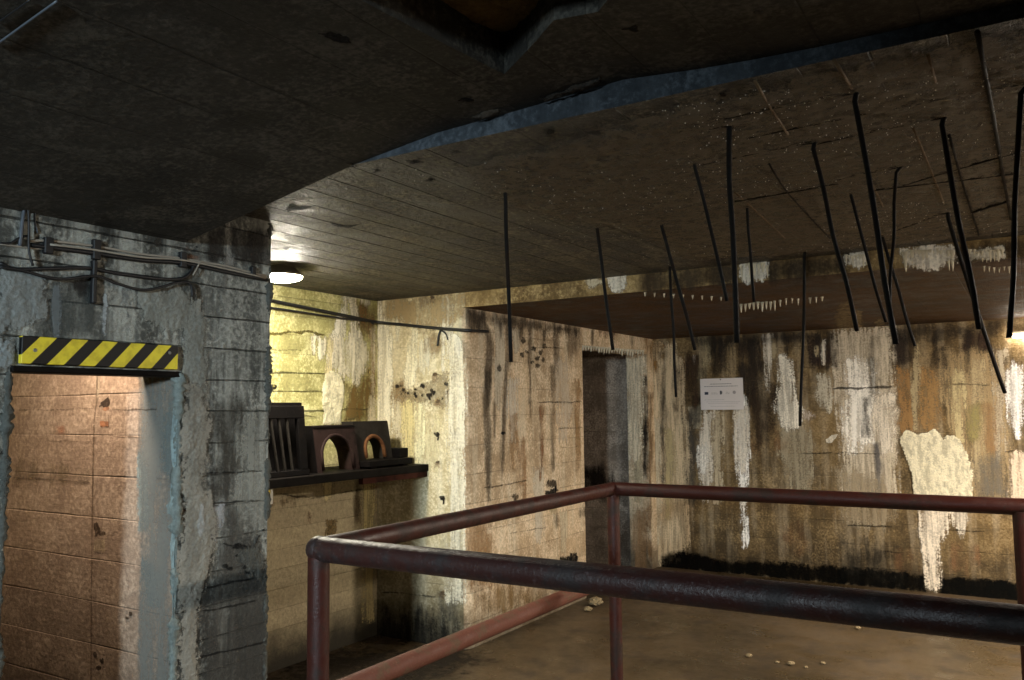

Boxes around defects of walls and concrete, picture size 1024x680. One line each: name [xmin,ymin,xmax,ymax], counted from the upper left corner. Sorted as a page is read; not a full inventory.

spalling [441,0,538,32]
spalling [452,28,1024,260]
leakage [900,241,1024,271]
spalling [520,337,546,368]
spalling [395,371,456,410]
leakage [311,295,594,513]
leakage [626,301,1024,498]
leakage [584,465,615,487]
leakage [198,398,307,680]
leakage [446,529,466,551]
leakage [657,498,1017,601]
leakage [445,578,467,604]